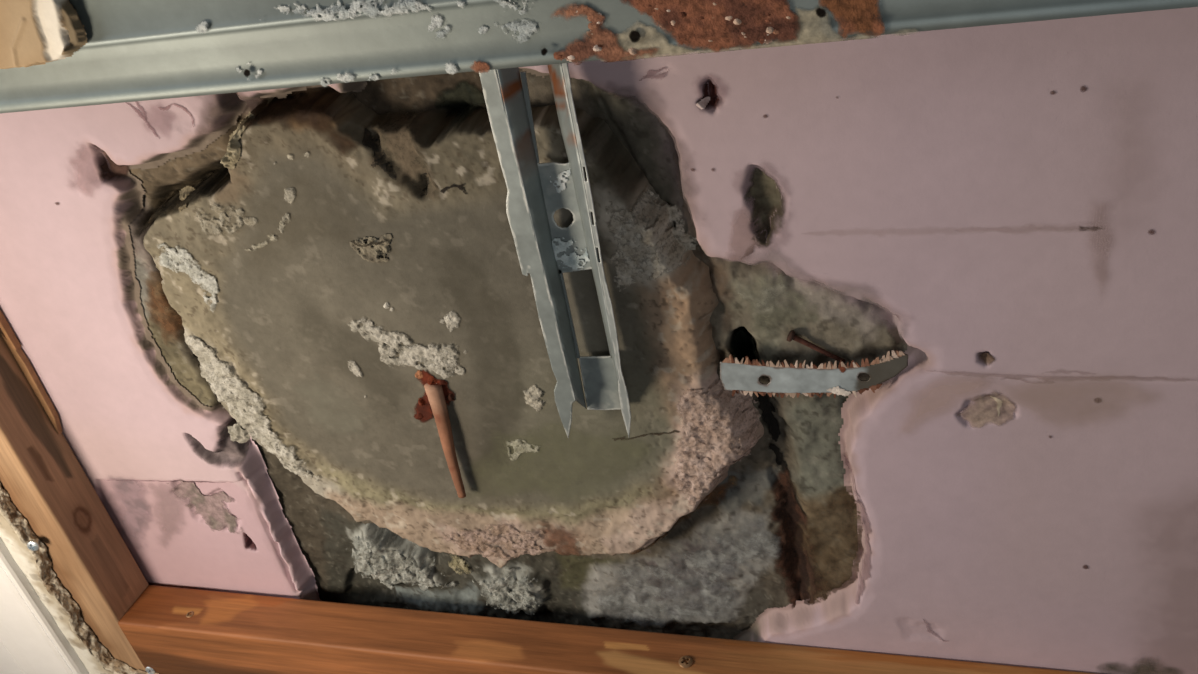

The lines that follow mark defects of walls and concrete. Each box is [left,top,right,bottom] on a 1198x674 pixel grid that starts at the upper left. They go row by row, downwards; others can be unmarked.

rust [553,5,657,65]
rust [621,0,799,52]
rust [819,0,885,38]
spalling [371,109,438,198]
spalling [731,168,784,262]
peeling [350,234,392,263]
rust [414,370,455,423]
rust [772,470,831,608]